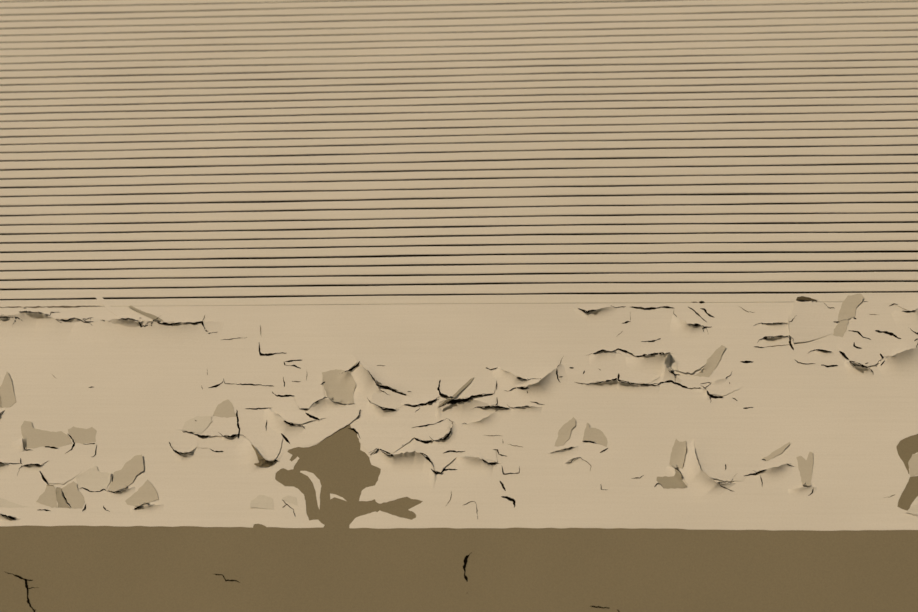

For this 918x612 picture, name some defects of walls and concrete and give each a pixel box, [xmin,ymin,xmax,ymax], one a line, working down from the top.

crack [202,326,307,410]
peeling [579,315,743,402]
crack [688,301,715,321]
crack [849,303,918,349]
peeling [12,421,97,453]
peeling [0,455,164,521]
peeling [167,345,568,532]
crack [431,450,465,474]
crack [493,439,520,508]
peeling [654,434,817,499]
peeling [884,434,918,515]
crack [4,571,39,612]